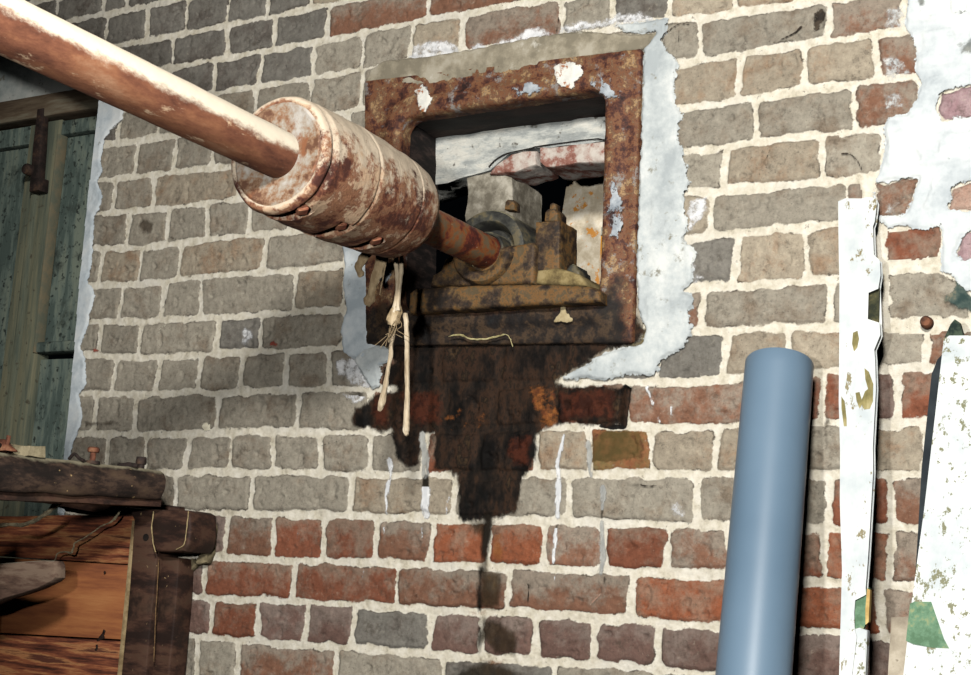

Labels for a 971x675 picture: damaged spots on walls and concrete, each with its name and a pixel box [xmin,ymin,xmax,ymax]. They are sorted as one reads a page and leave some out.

peeling [873,0,971,291]
rust [531,388,557,425]
leakage [473,513,516,652]
leakage [460,663,515,675]